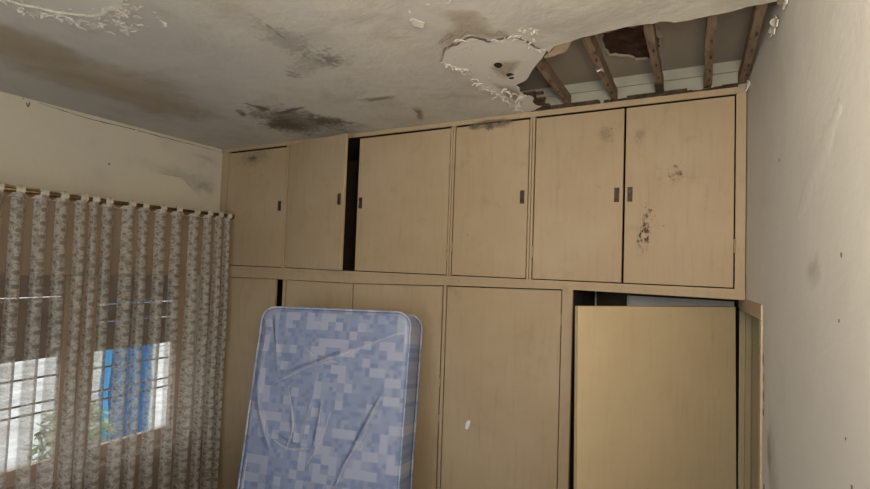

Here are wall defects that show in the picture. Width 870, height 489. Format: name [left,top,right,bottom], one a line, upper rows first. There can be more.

spalling [591,4,761,61]
peeling [438,28,750,117]
damp [240,105,344,138]